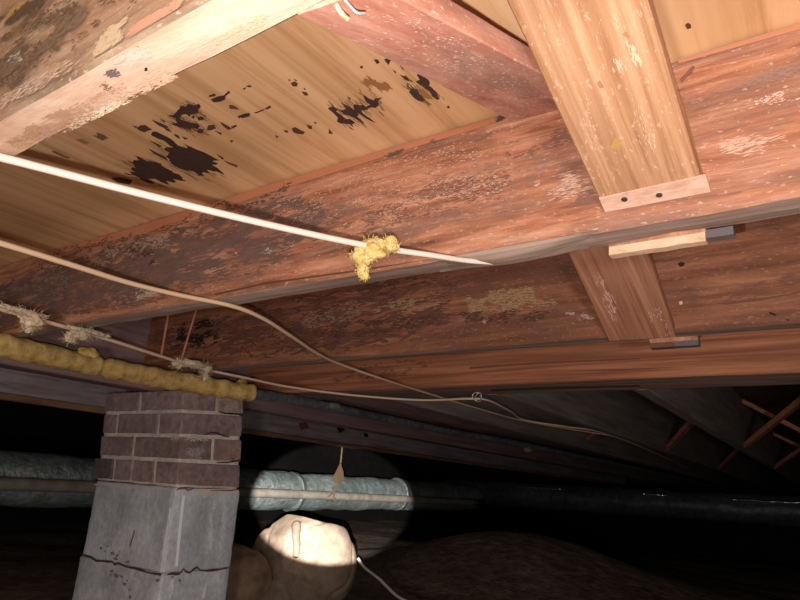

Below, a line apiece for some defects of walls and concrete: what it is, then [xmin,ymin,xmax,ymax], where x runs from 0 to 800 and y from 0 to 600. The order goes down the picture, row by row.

mould [6,83,127,149]
mould [0,0,183,109]
water stain [111,91,271,187]
water stain [328,66,393,131]
water stain [374,59,450,108]
water stain [0,128,598,330]
water stain [147,262,582,360]
crack [81,530,227,576]